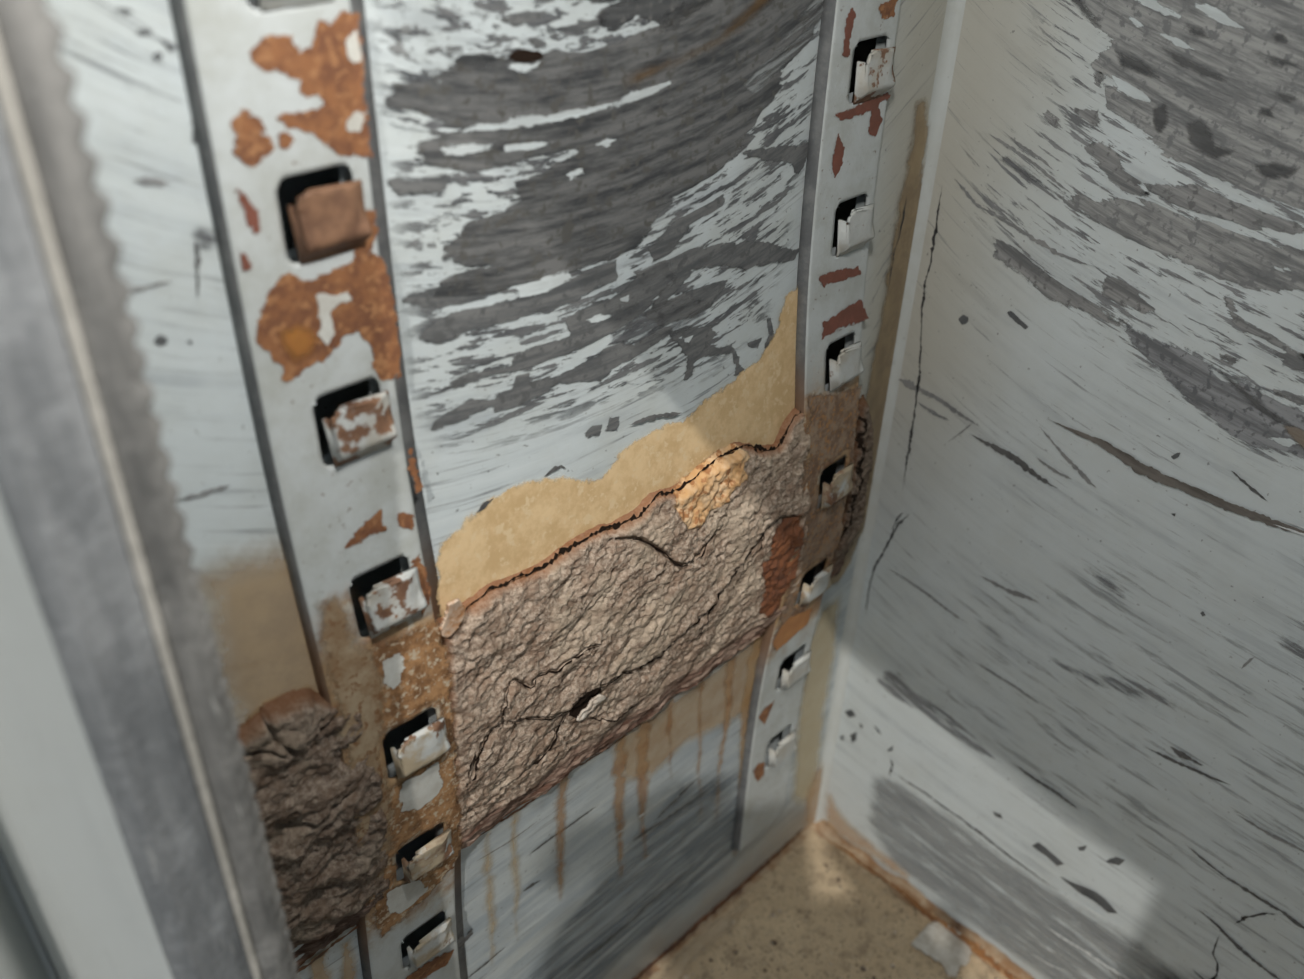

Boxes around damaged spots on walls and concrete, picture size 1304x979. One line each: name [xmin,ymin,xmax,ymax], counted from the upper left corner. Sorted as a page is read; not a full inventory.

rust [230,10,374,167]
rust [255,209,402,382]
peeling [383,0,824,438]
rust [832,92,891,178]
peeling [977,0,1304,459]
rust [369,554,462,938]
peeling [436,408,812,850]
crack [468,516,794,836]
rust [612,386,861,859]
peeling [878,672,992,757]
spalling [1053,421,1304,536]
crack [1165,912,1278,979]